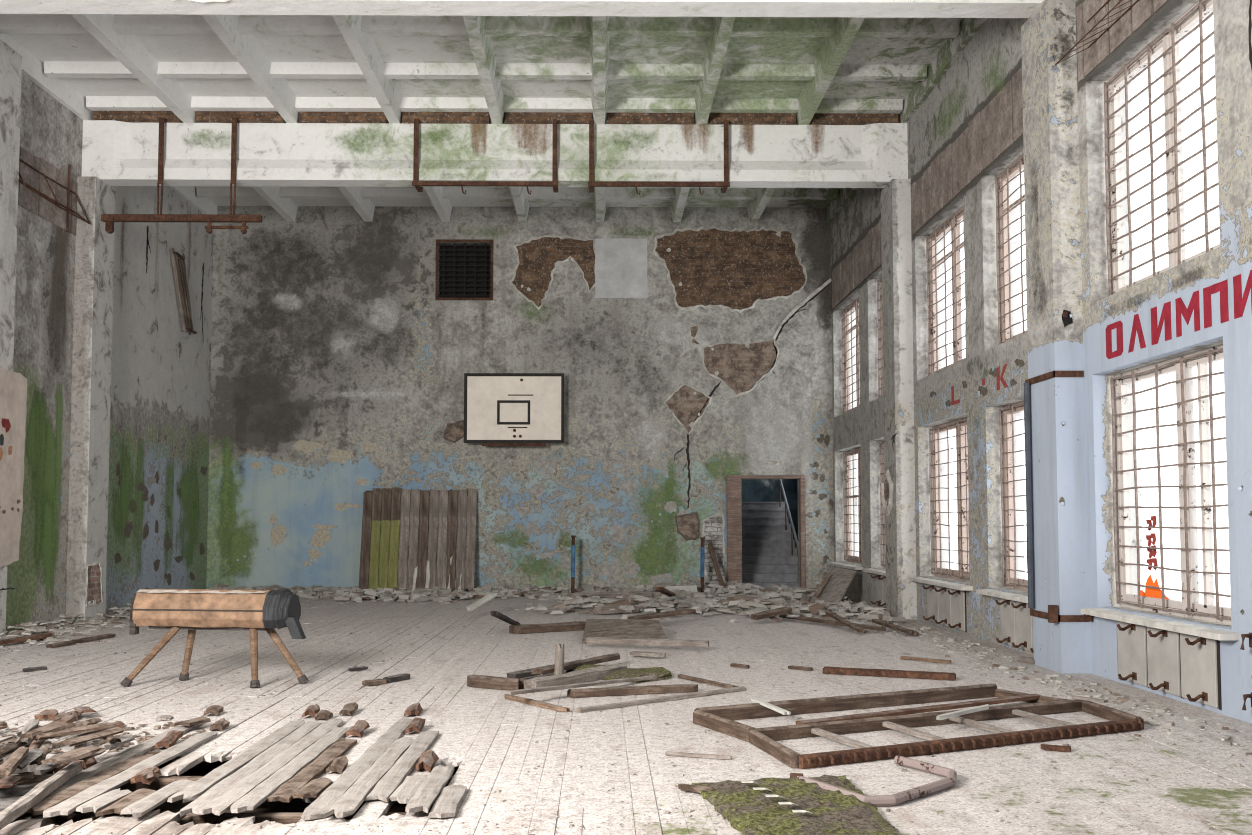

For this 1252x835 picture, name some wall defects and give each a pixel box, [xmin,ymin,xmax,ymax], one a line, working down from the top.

flaking render [510,235,596,310]
flaking render [653,226,807,314]
water stain [221,231,413,576]
flaking render [663,384,712,434]
flaking render [689,325,779,397]
crack [673,278,831,509]
water stain [26,387,63,597]
water stain [134,441,144,572]
water stain [165,464,199,568]